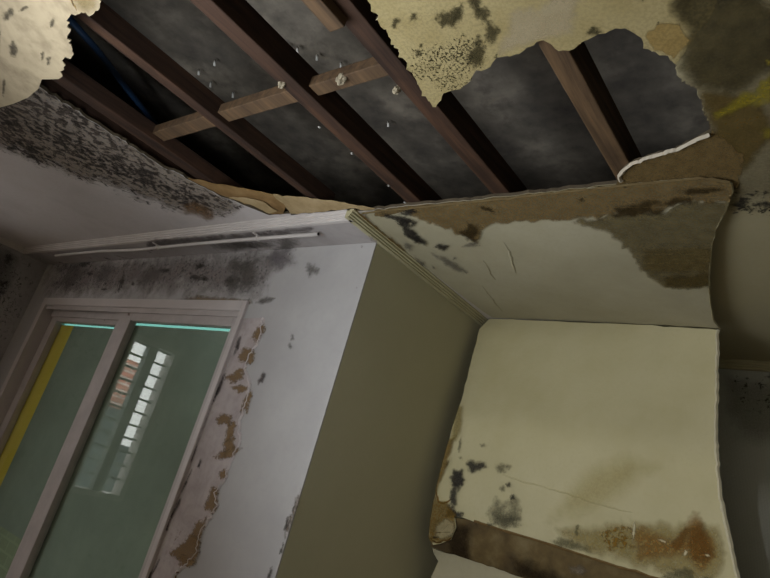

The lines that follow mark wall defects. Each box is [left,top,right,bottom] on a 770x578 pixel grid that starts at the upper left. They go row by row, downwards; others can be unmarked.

water stain [0,87,242,219]
water stain [359,0,770,289]
water stain [54,228,312,303]
peeling [148,317,266,578]
water stain [429,408,486,558]
water stain [488,482,516,527]
water stain [556,525,722,578]
rust [601,518,714,569]